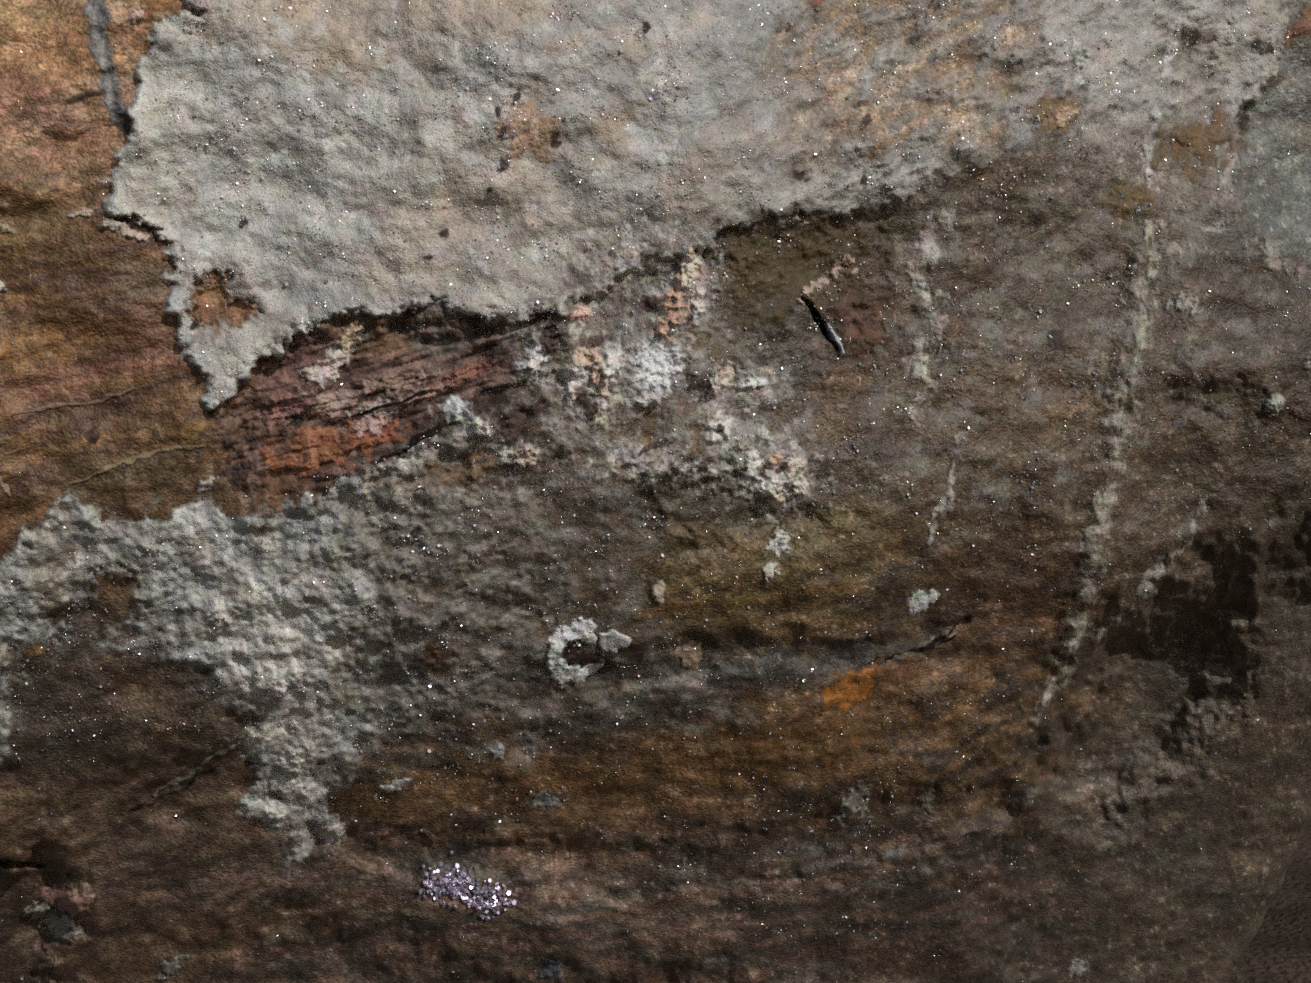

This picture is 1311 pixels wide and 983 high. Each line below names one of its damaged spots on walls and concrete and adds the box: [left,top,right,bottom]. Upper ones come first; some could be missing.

damp [102,0,1289,524]
damp [1246,236,1305,280]
spalling [206,300,545,532]
damp [926,436,960,545]
damp [1032,215,1230,725]
damp [0,390,578,867]
damp [457,570,631,684]